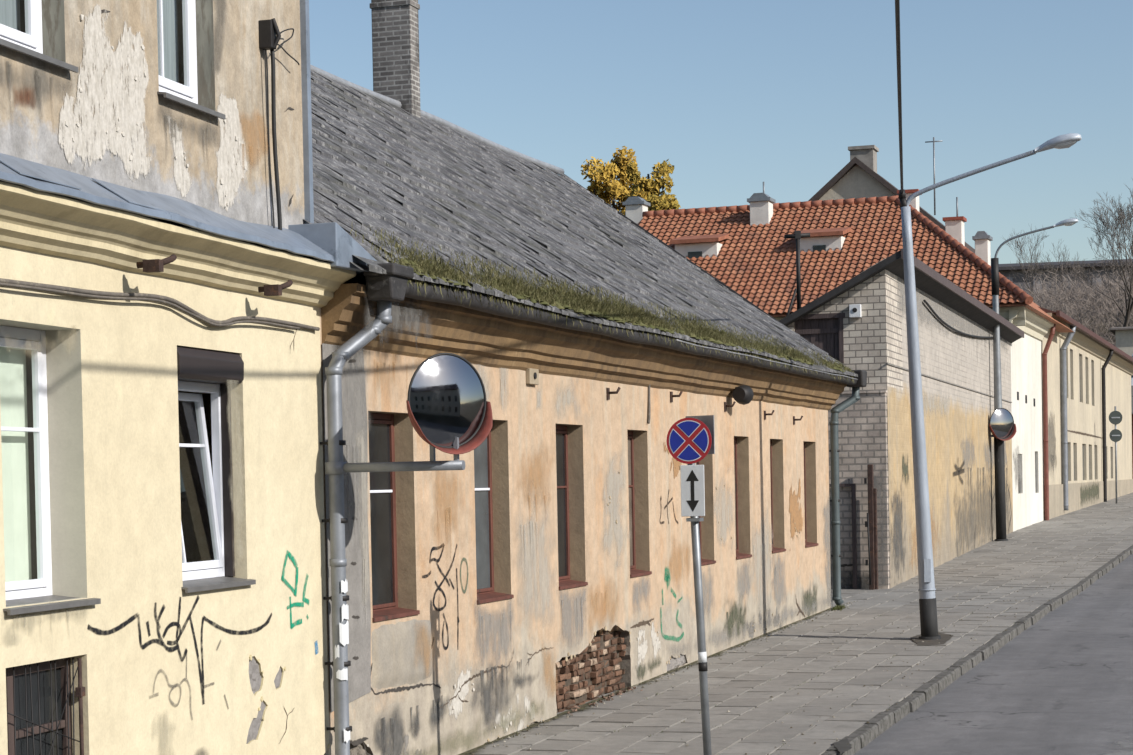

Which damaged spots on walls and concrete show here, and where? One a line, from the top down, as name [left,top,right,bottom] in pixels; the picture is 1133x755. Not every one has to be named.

peeling [58,4,152,181]
peeling [168,115,192,198]
peeling [216,93,248,211]
damp [957,442,1022,555]
flaking render [246,655,286,744]
flaking render [350,743,373,755]
damp [375,695,446,755]
flaking render [487,621,688,744]